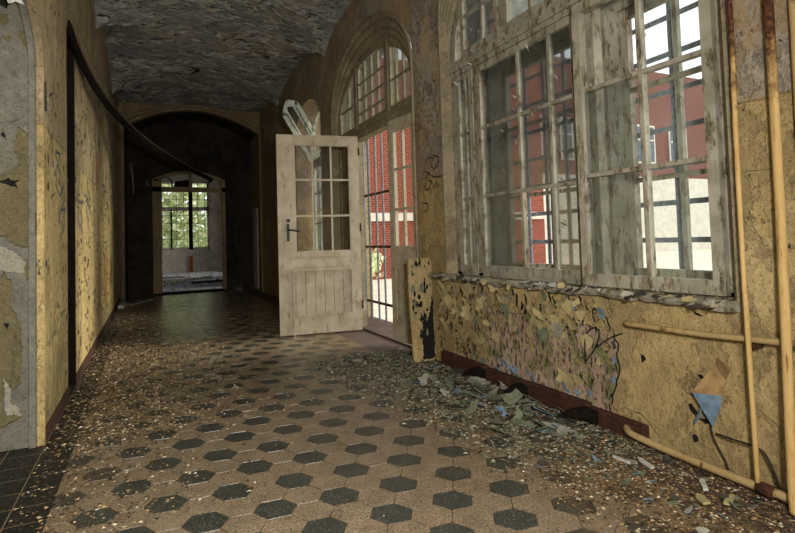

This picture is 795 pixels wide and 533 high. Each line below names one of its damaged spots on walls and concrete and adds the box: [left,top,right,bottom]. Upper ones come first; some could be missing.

peeling [0,127,37,429]
peeling [348,258,621,467]
peeling [688,356,730,427]